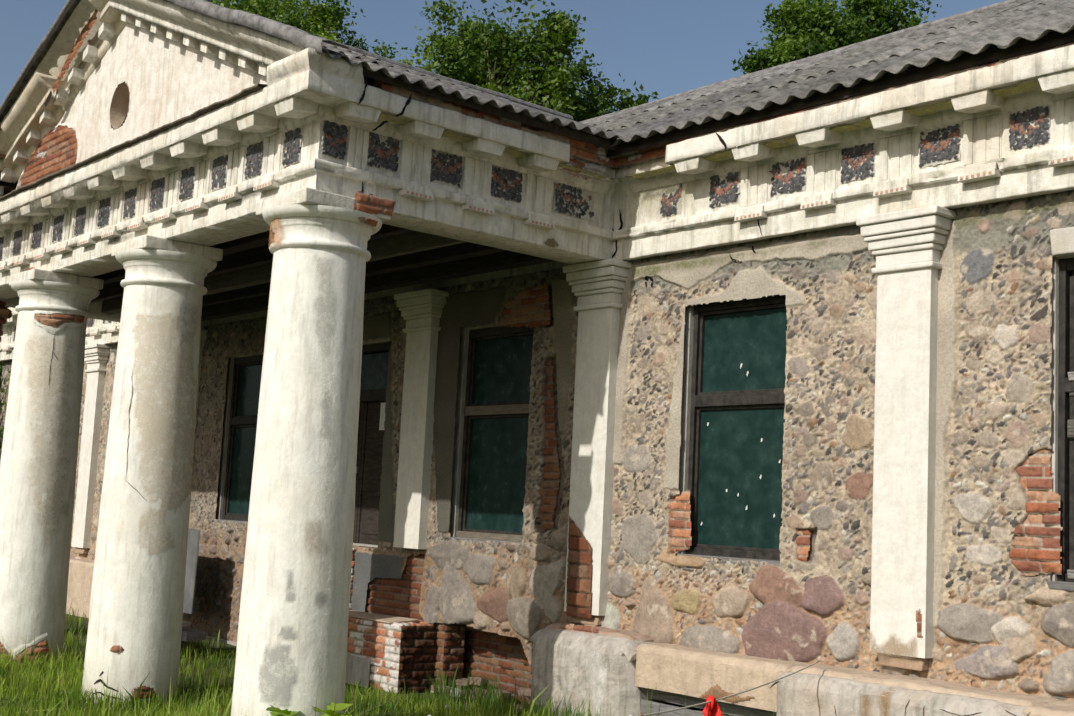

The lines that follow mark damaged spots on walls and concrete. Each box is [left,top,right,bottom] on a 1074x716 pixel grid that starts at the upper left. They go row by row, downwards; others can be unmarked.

crack [358,75,368,105]
crack [373,93,412,131]
spalling [16,121,81,189]
spalling [353,190,396,227]
spalling [30,309,86,334]
spalling [539,359,561,532]
spalling [561,516,597,633]
spalling [669,490,692,553]
spalling [796,529,812,562]
spalling [1009,449,1063,576]
spalling [0,632,54,668]
water stain [260,628,296,706]